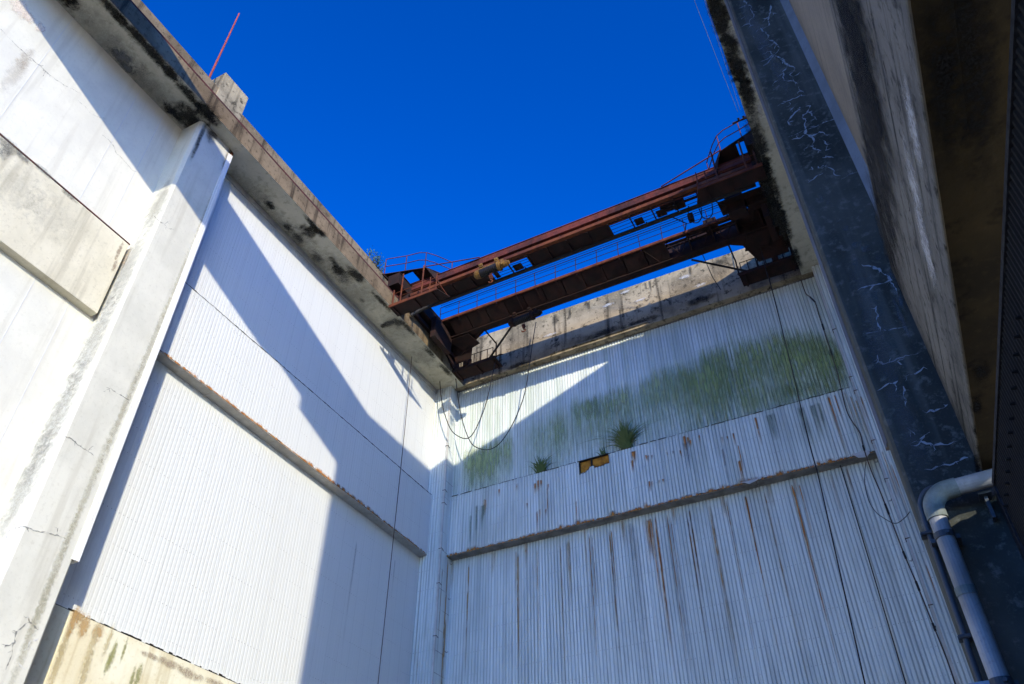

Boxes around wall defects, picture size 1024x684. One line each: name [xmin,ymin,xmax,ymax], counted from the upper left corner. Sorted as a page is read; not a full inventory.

damp [101,0,220,154]
crack [740,0,853,183]
damp [284,219,325,243]
damp [312,255,364,283]
damp [361,292,415,335]
damp [586,327,615,342]
damp [638,331,844,413]
corrosion [164,353,425,553]
damp [464,437,512,481]
corrosion [438,433,856,684]
crack [2,616,39,682]